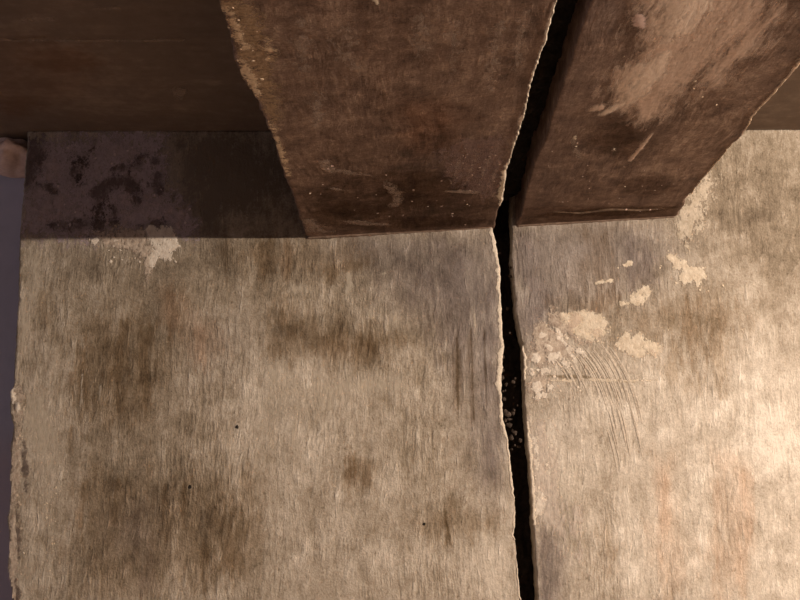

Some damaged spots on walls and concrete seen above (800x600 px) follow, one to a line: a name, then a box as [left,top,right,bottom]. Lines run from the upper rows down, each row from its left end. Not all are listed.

crack [488,0,578,600]